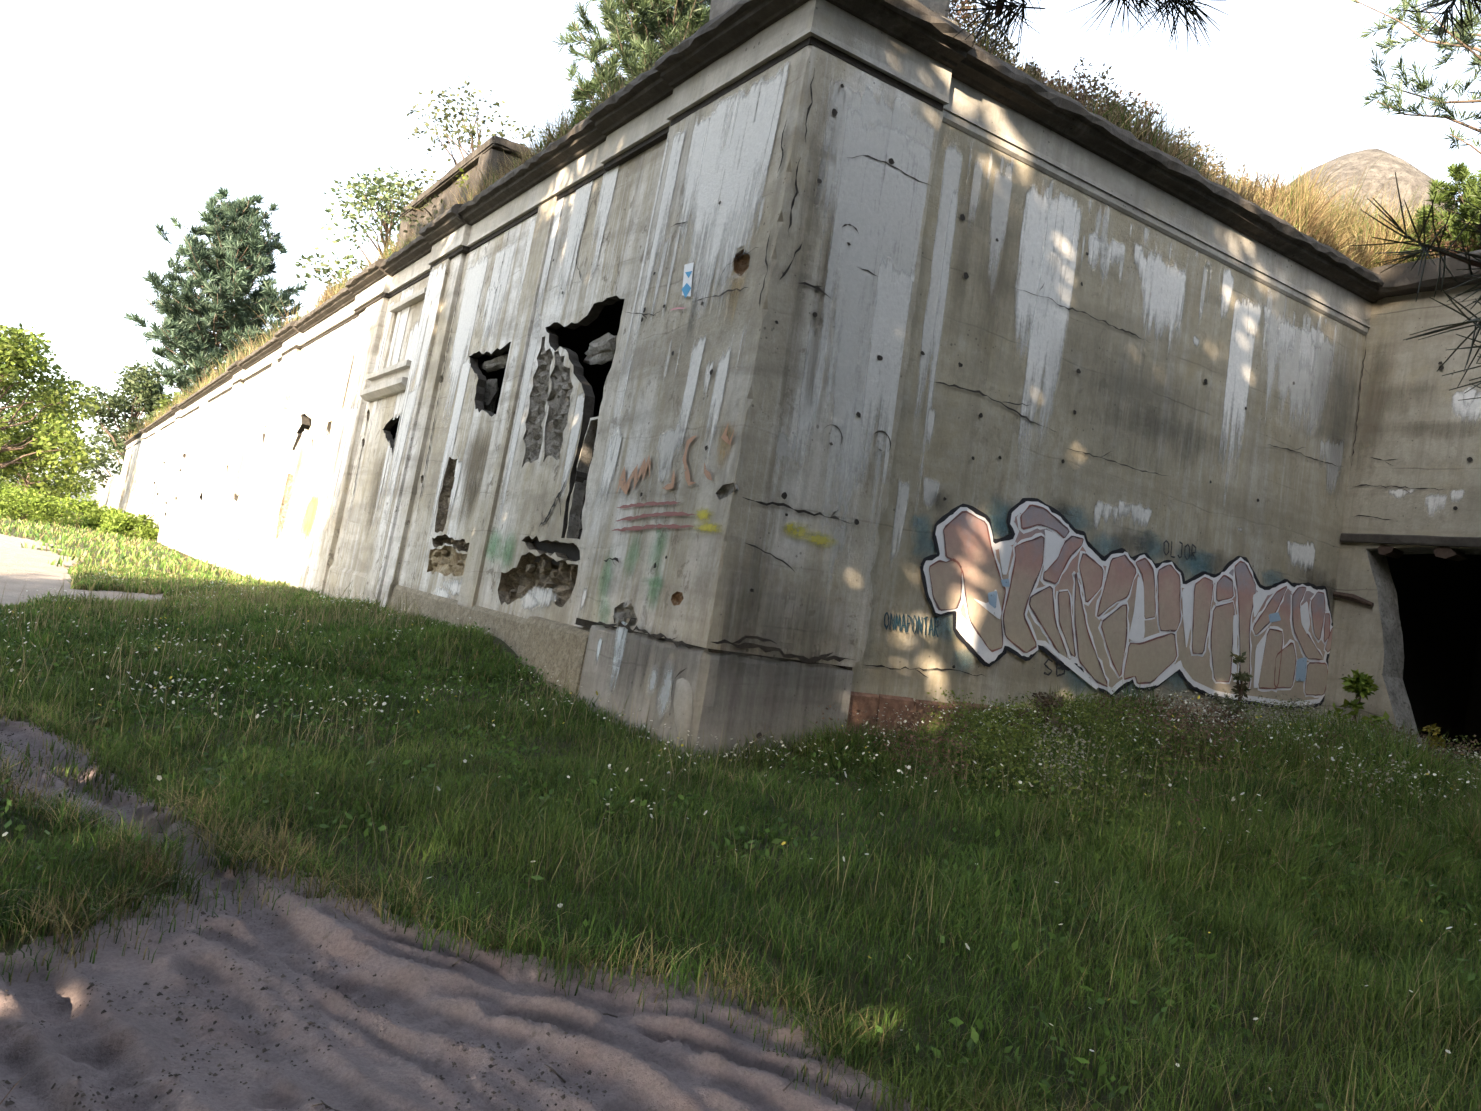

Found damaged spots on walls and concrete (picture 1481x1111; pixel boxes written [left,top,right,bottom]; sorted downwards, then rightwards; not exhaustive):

damp [622,63,789,406]
damp [796,83,1336,554]
spalling [522,336,573,467]
damp [658,331,746,481]
corrosion [300,494,319,542]
spalling [427,457,467,599]
spalling [498,552,578,609]
spalling [566,419,598,540]
damp [1288,542,1315,570]